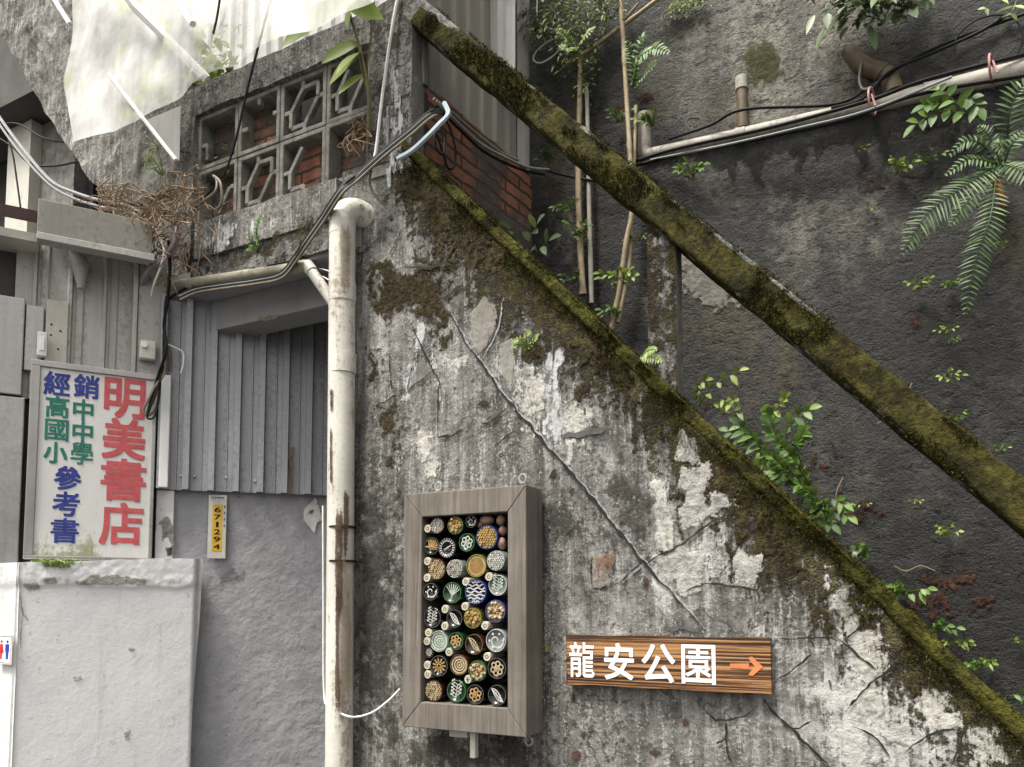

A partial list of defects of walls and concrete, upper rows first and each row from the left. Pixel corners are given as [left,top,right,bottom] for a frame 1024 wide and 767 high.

damp [688,81,1024,188]
crack [356,230,775,632]
peeling [674,428,739,531]
peeling [158,517,175,552]
corrosion [335,492,349,711]
spalling [592,550,616,589]
peeling [643,545,707,598]
peeling [733,547,763,588]
crack [777,617,965,767]